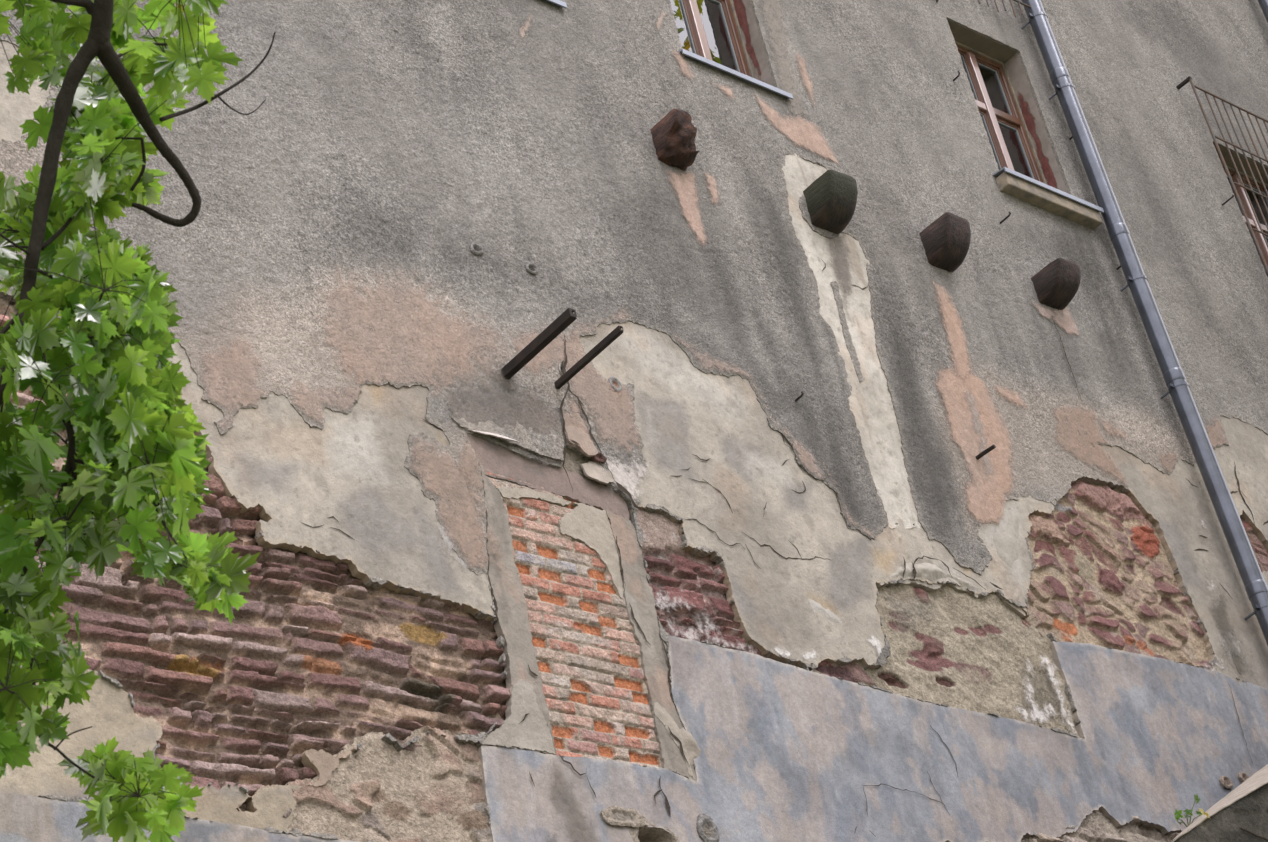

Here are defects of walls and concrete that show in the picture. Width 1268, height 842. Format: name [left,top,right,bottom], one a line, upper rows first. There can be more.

flaking render [0,298,18,332]
flaking render [0,340,519,842]
crack [675,419,867,569]
flaking render [518,311,1268,738]
flaking render [651,702,695,779]
flaking render [1021,809,1180,842]